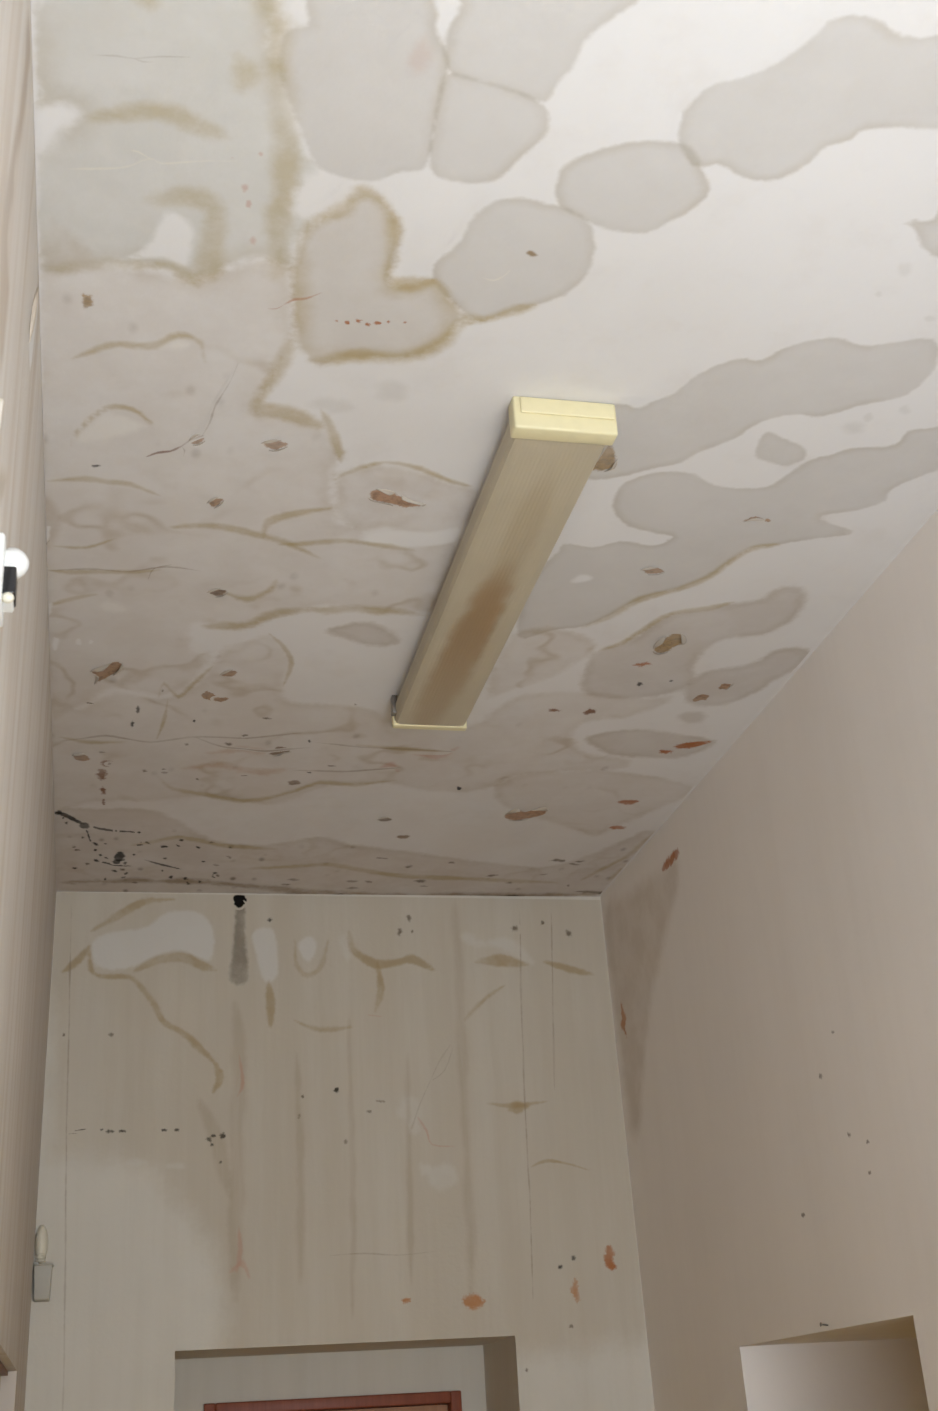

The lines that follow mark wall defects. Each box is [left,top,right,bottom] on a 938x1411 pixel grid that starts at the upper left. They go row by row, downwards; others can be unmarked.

water stain [0,0,31,387]
water stain [31,0,938,698]
water stain [39,333,938,1392]
rust [660,843,681,878]
rust [455,1286,492,1317]
rust [599,1240,623,1276]